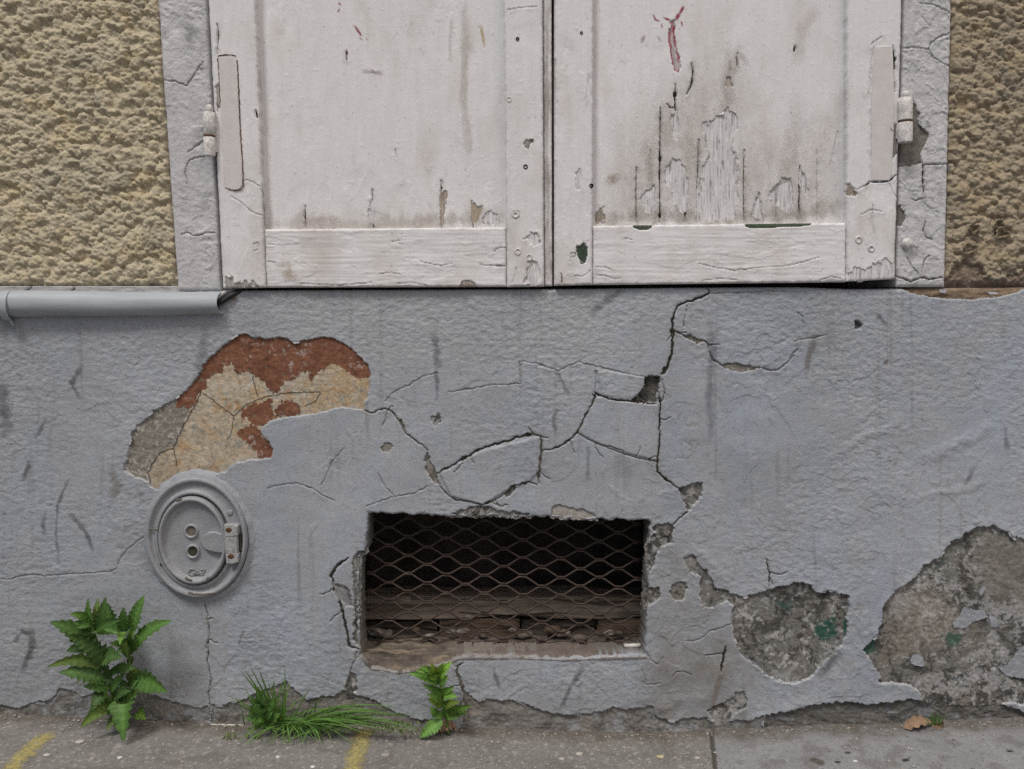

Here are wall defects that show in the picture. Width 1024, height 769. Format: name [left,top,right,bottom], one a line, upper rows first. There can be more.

peeling [633,109,811,230]
spalling [124,334,371,489]
crack [370,257,837,543]
peeling [0,688,111,718]
crack [330,557,357,688]
crack [452,663,470,723]
spalling [127,523,1024,734]
crack [642,611,767,684]